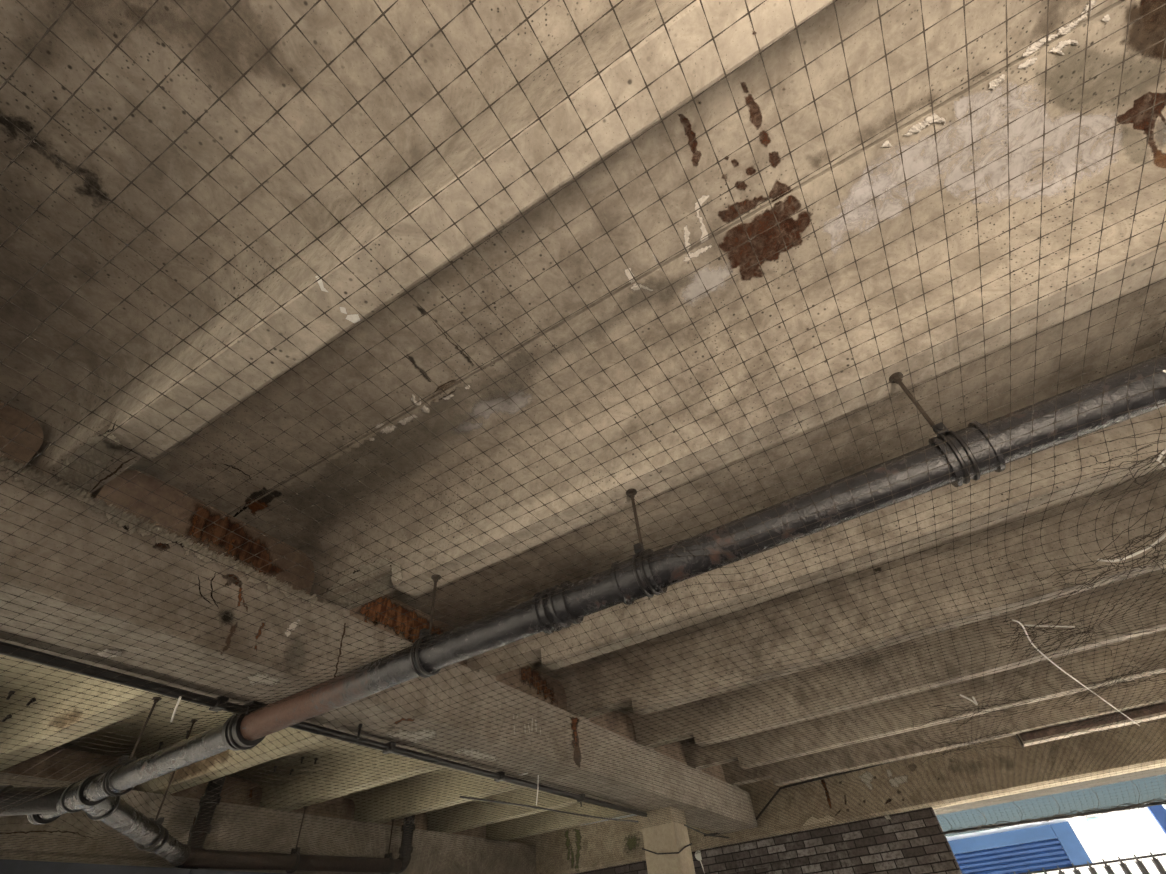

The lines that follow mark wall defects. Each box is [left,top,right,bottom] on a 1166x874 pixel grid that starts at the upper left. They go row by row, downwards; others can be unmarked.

water stain [1018,0,1110,69]
rust [1123,0,1166,60]
water stain [0,113,108,207]
rust [678,114,701,166]
rust [718,82,812,280]
water stain [825,74,1166,251]
water stain [687,270,728,300]
spalling [0,454,318,612]
spalling [589,636,632,654]
rust [571,717,581,768]